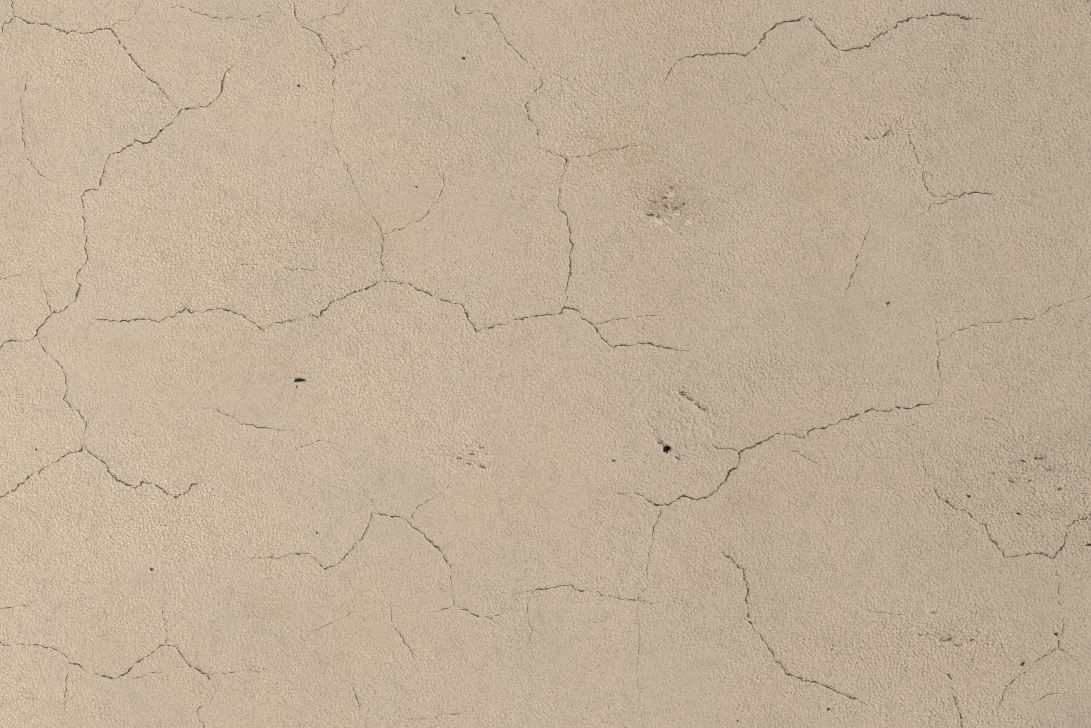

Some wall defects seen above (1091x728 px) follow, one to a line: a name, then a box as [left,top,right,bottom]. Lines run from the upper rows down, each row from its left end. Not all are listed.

crack [665,12,980,114]
crack [95,4,690,352]
crack [908,132,1005,215]
crack [0,1,229,498]
crack [249,487,499,619]
crack [517,295,1091,709]
crack [0,595,266,728]